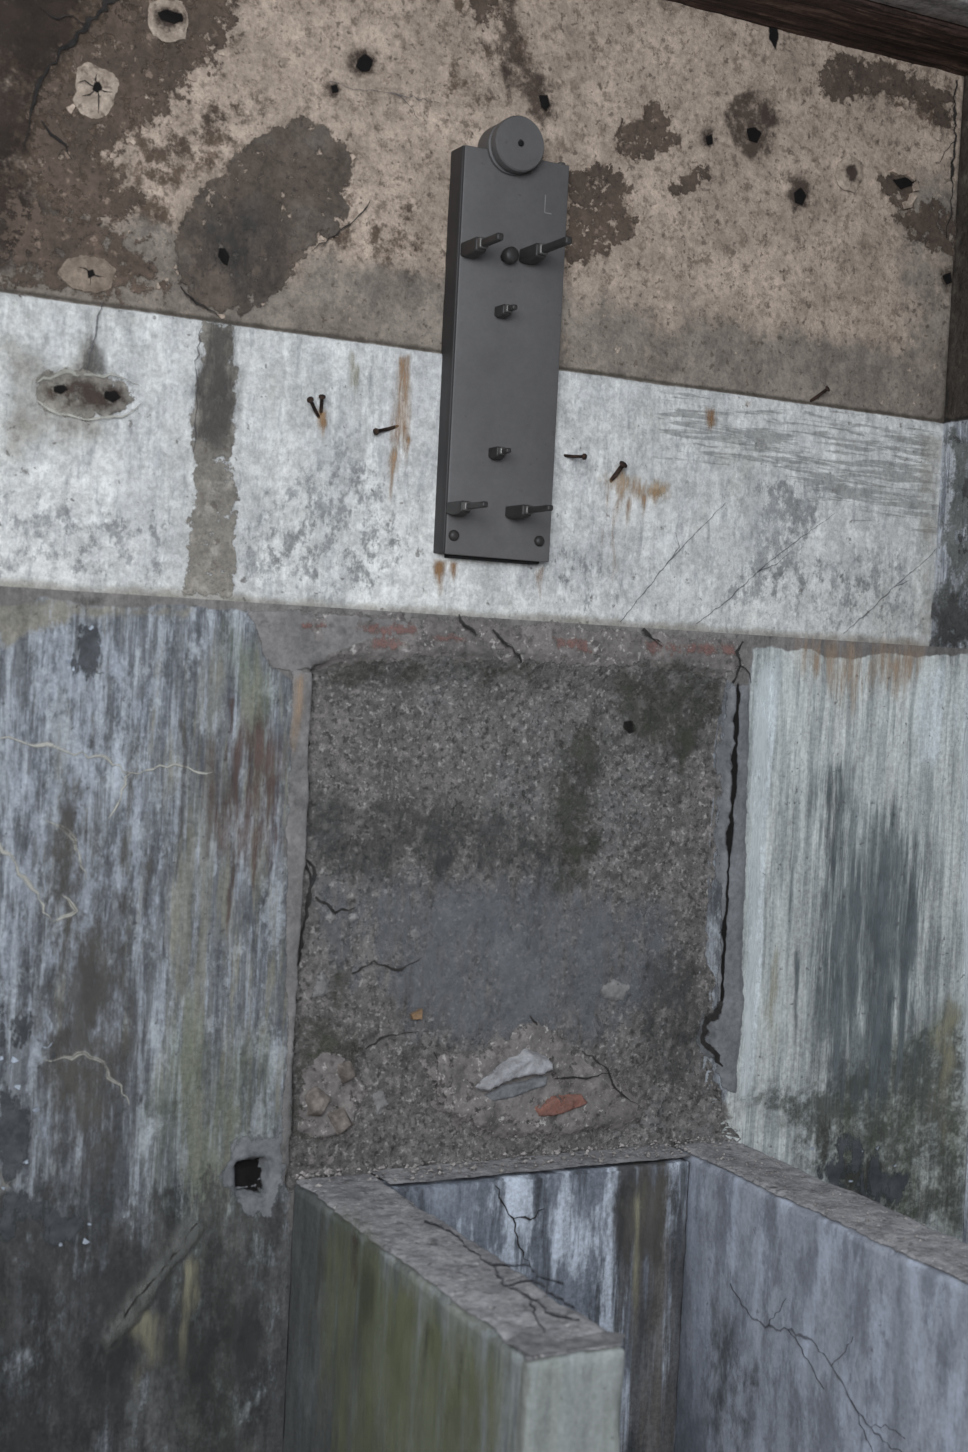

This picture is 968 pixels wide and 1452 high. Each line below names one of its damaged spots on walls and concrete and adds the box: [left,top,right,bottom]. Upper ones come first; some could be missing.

flaking render [0,0,370,319]
spalling [35,367,141,421]
corrosion [391,359,410,478]
corrosion [617,472,665,510]
spalling [298,607,745,679]
water stain [929,594,968,649]
crack [700,641,751,1067]
water stain [45,806,130,1168]
water stain [816,782,929,1104]
spalling [418,1012,648,1142]
crack [424,1185,580,1333]
crack [730,1283,906,1452]